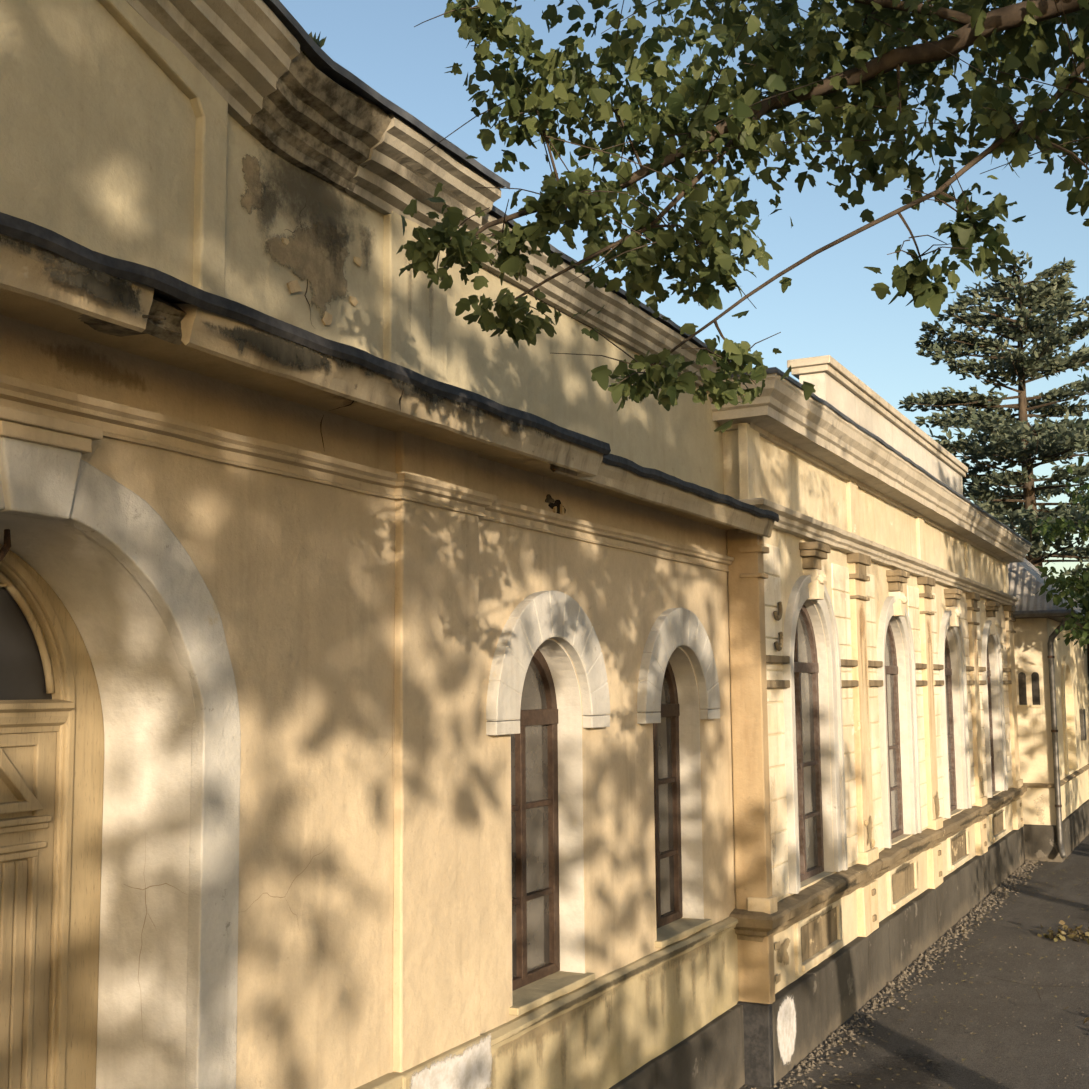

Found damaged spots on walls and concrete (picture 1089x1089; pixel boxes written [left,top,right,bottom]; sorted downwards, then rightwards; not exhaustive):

flaking render [241,154,262,214]
damp [260,159,348,260]
flaking render [266,226,362,325]
damp [361,227,372,267]